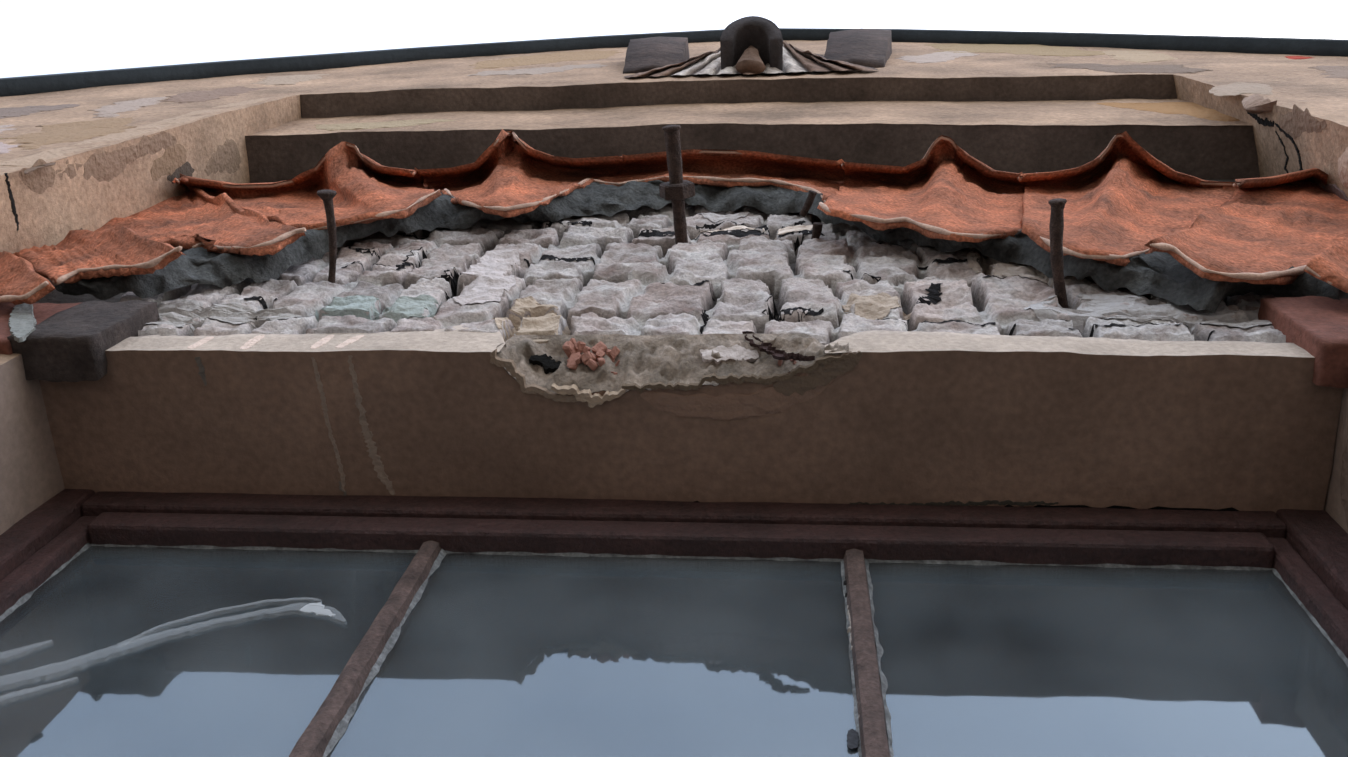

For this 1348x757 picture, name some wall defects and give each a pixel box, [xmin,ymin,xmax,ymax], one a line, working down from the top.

crack [1247,112,1303,173]
crack [4,173,19,231]
flaking render [0,176,1342,408]